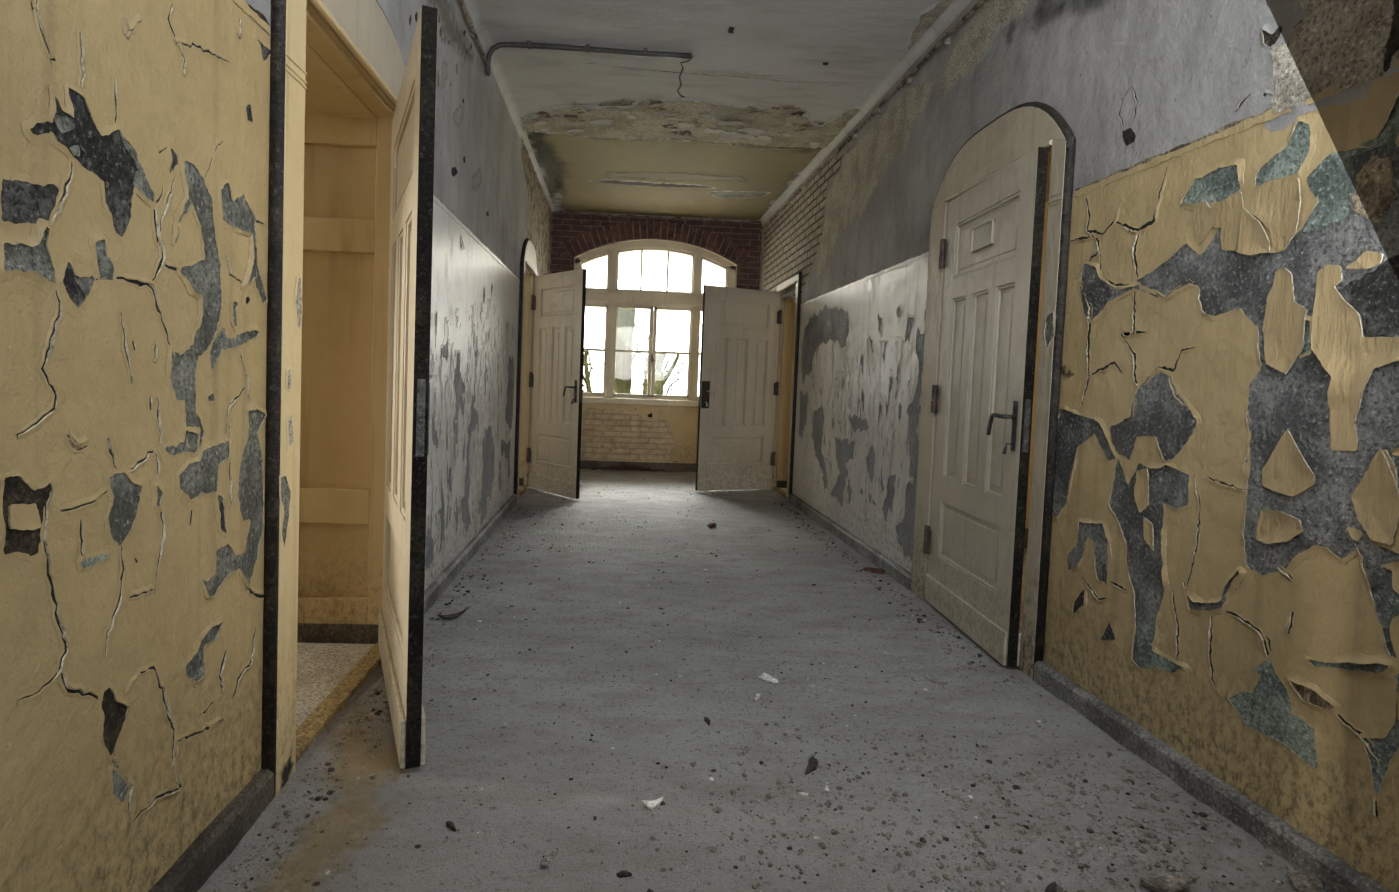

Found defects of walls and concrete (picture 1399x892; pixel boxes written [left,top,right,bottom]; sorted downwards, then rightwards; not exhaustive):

crack [31,0,121,124]
crack [122,1,242,76]
flaking render [520,0,1034,302]
crack [16,136,265,832]
peeling [0,78,292,600]
peeling [425,283,515,578]
flaking render [580,406,677,463]
peeling [798,304,926,563]
peeling [1043,309,1056,350]
peeling [1052,0,1399,801]
peeling [96,682,132,806]
peeling [181,616,223,688]